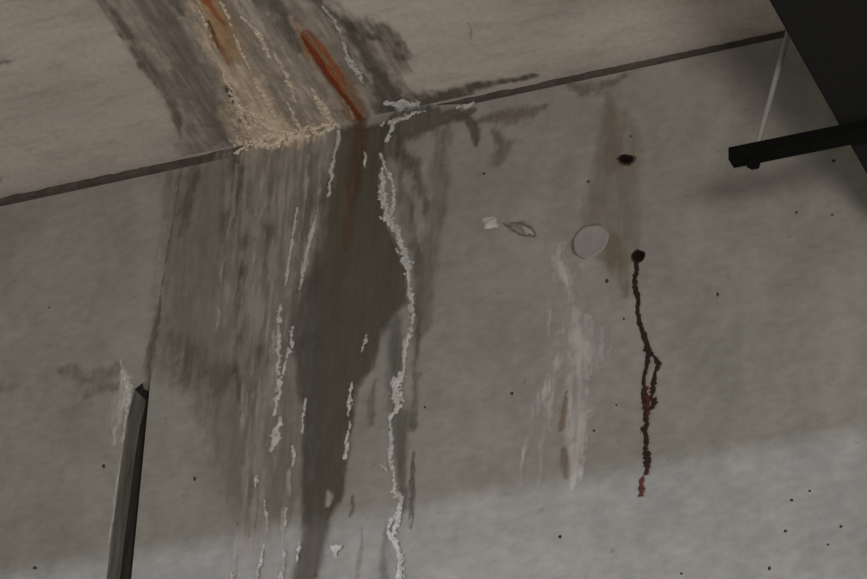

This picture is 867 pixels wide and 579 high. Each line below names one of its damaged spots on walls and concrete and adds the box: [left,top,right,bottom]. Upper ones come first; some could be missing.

damp [110,9,172,84]
corrosion [301,30,365,205]
damp [110,360,135,445]
damp [164,0,546,579]
damp [519,239,605,490]
crack [632,261,662,497]